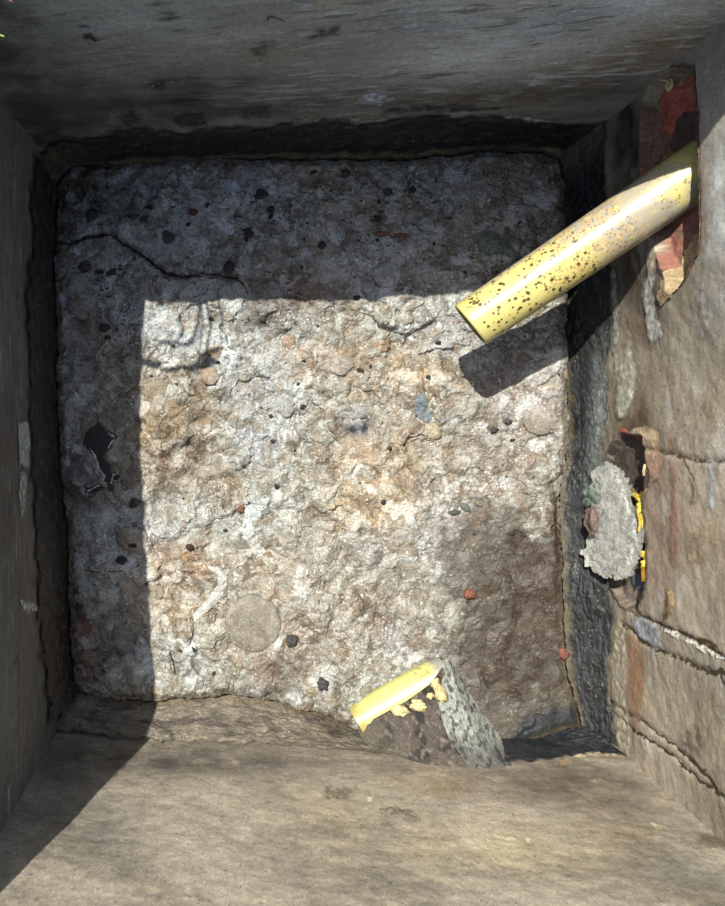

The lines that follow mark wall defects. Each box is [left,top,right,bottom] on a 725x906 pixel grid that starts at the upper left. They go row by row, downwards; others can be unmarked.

spalling [638,63,701,306]
crack [57,233,247,292]
crack [659,450,725,481]
peeling [584,506,599,535]
spalling [604,425,663,617]
crack [621,615,725,684]
crack [610,700,725,798]